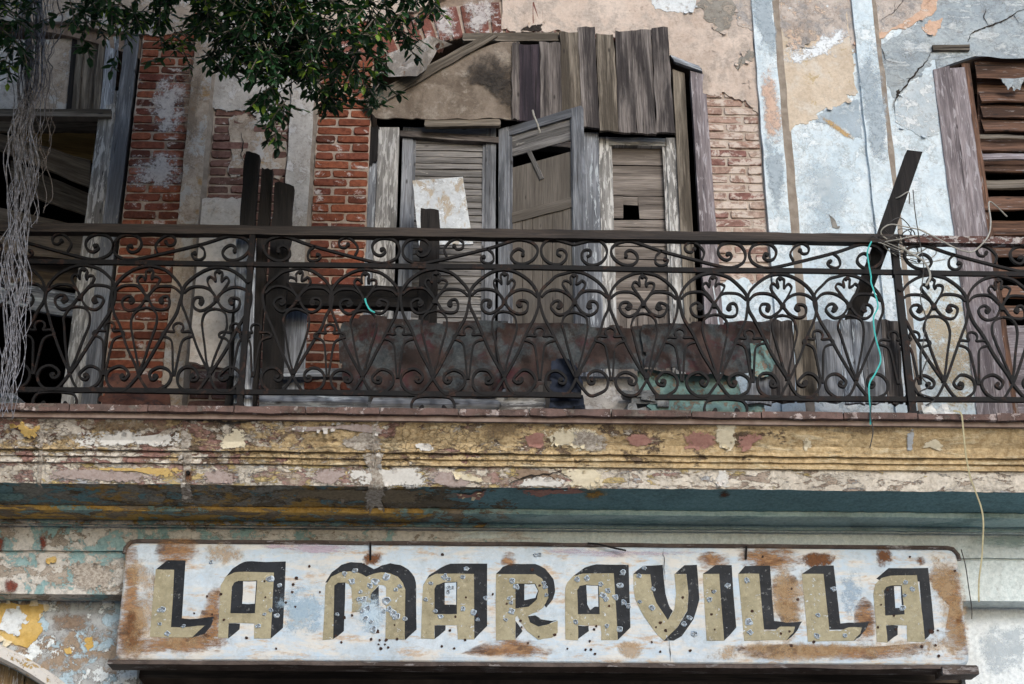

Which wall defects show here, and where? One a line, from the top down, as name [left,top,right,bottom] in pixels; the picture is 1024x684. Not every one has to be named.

flaking render [122,12,197,224]
damp [466,55,512,108]
flaking render [651,0,863,285]
crack [880,46,932,110]
peeling [876,0,1024,138]
crack [968,9,1024,41]
flaking render [101,237,175,404]
peeling [35,426,195,508]
peeling [263,421,485,515]
peeling [0,600,50,648]
corrosion [466,640,547,657]
corrosion [722,546,967,660]